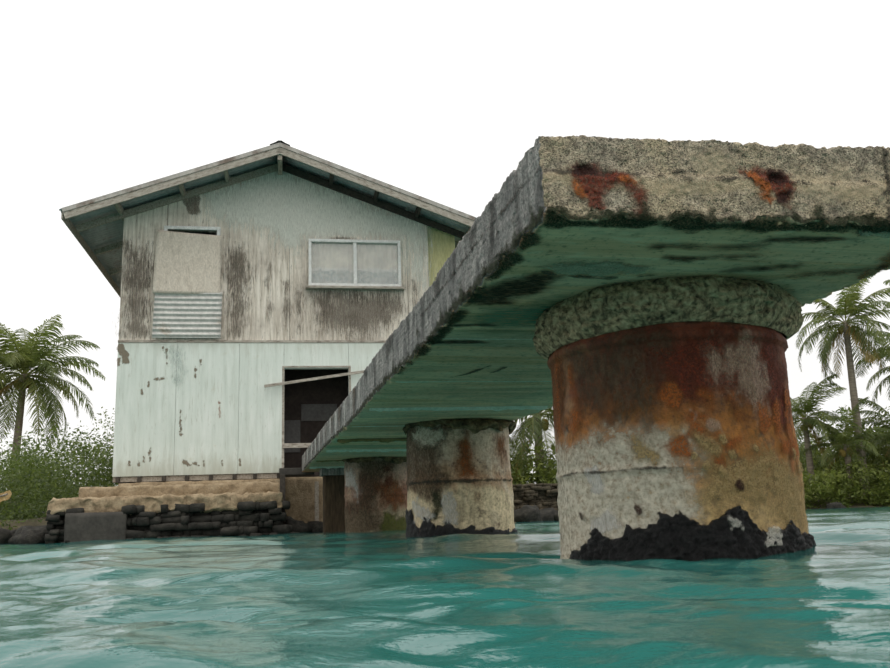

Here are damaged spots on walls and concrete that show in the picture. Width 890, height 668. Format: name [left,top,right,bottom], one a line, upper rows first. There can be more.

corrosion [572,164,647,213]
corrosion [740,167,796,204]
leakage [118,242,154,340]
leakage [220,243,271,337]
leakage [283,208,560,374]
peeling [117,344,130,366]
leakage [304,359,376,465]
corrosion [459,437,478,479]
corrosion [496,436,507,462]
corrosion [550,352,579,438]
corrosion [629,328,799,470]